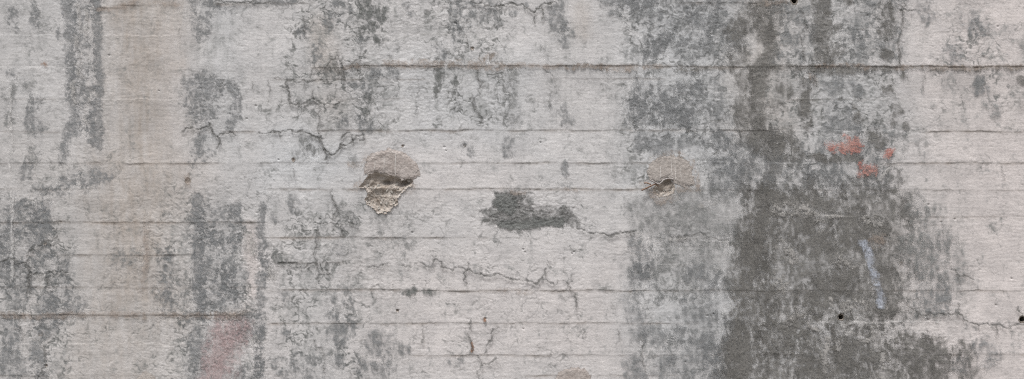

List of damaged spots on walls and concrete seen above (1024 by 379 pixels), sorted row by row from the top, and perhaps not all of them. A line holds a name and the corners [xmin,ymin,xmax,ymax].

crack [182,50,367,160]
spalling [359,145,420,214]
spalling [641,153,695,197]
water stain [600,0,1024,379]
crack [368,259,577,308]